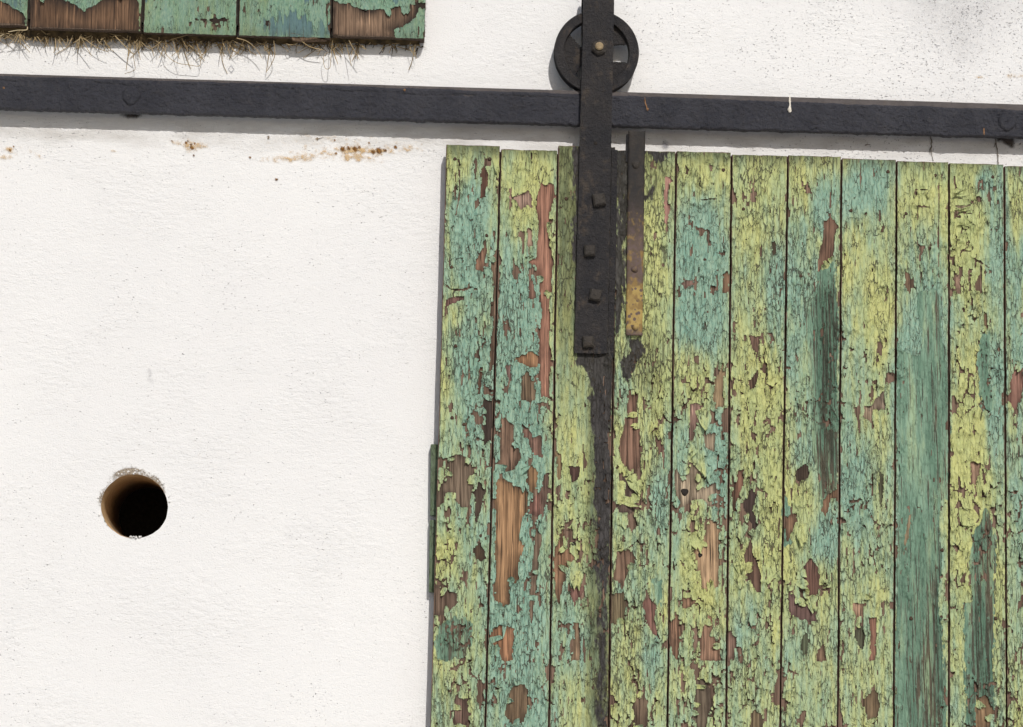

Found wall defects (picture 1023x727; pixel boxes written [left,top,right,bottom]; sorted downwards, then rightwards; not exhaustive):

corrosion [284,139,413,161]